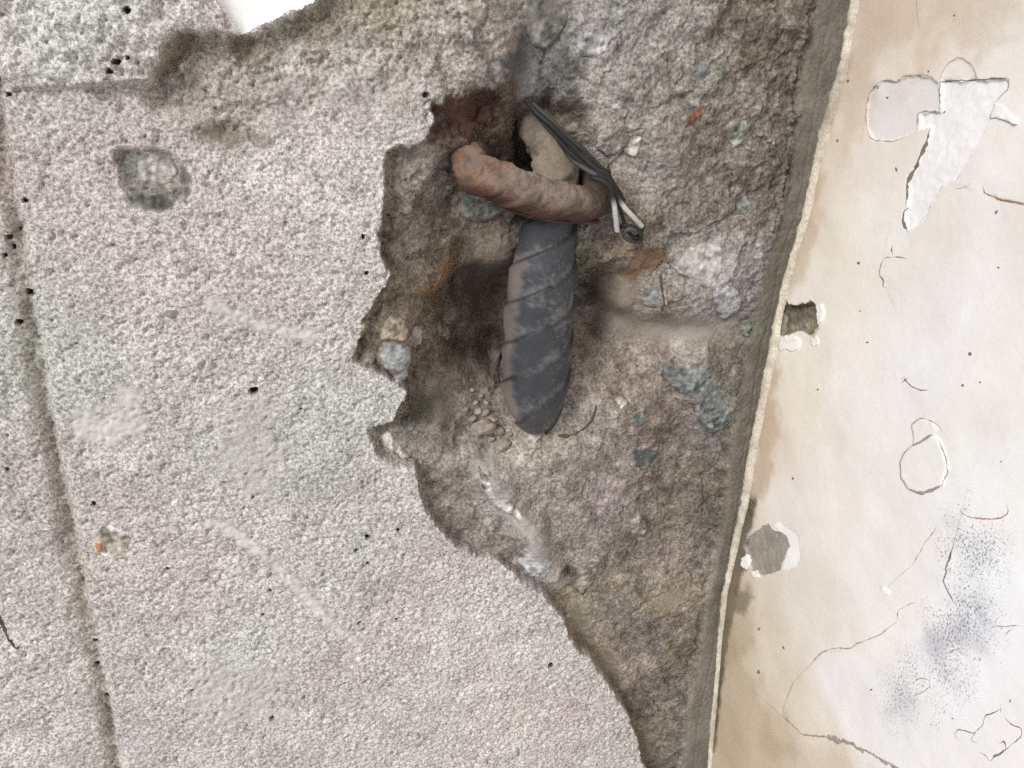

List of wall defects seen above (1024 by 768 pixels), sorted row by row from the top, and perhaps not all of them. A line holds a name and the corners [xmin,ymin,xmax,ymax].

corrosion [430,90,498,141]
peeling [865,57,1019,232]
spalling [134,0,860,768]
crack [888,507,1009,604]
crack [812,603,912,663]
damp [874,504,1012,736]
crack [955,709,1022,760]